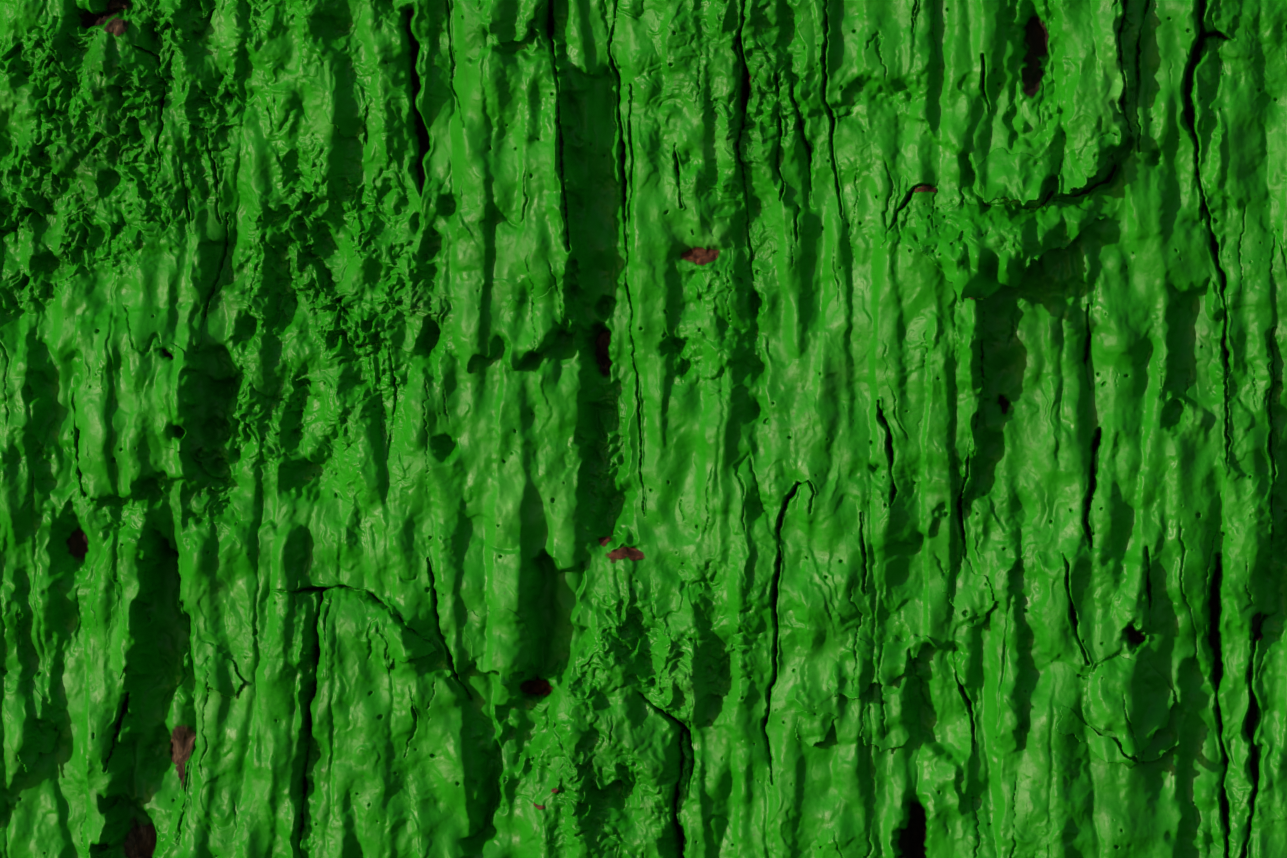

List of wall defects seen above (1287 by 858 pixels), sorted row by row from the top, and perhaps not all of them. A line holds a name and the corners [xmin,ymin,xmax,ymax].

crack [406,8,430,196]
peeling [1022,16,1049,97]
peeling [681,247,719,265]
crack [1185,0,1231,375]
peeling [124,817,156,858]
peeling [169,725,196,788]
crack [283,586,400,853]
crack [428,559,471,699]
peeling [599,530,644,563]
crack [642,694,694,858]
crack [764,483,813,763]
crack [1209,557,1264,858]